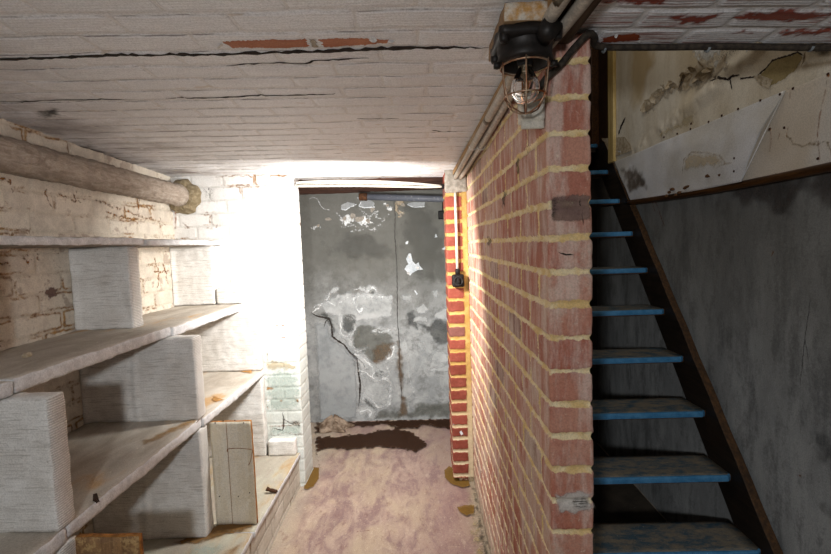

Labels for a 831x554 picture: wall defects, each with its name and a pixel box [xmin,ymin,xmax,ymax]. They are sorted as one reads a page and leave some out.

peeling [670,14,718,25]
peeling [601,33,641,43]
crack [0,46,489,66]
leakage [694,50,736,69]
crack [170,92,335,100]
peeling [405,241,422,275]
crack [312,313,365,408]